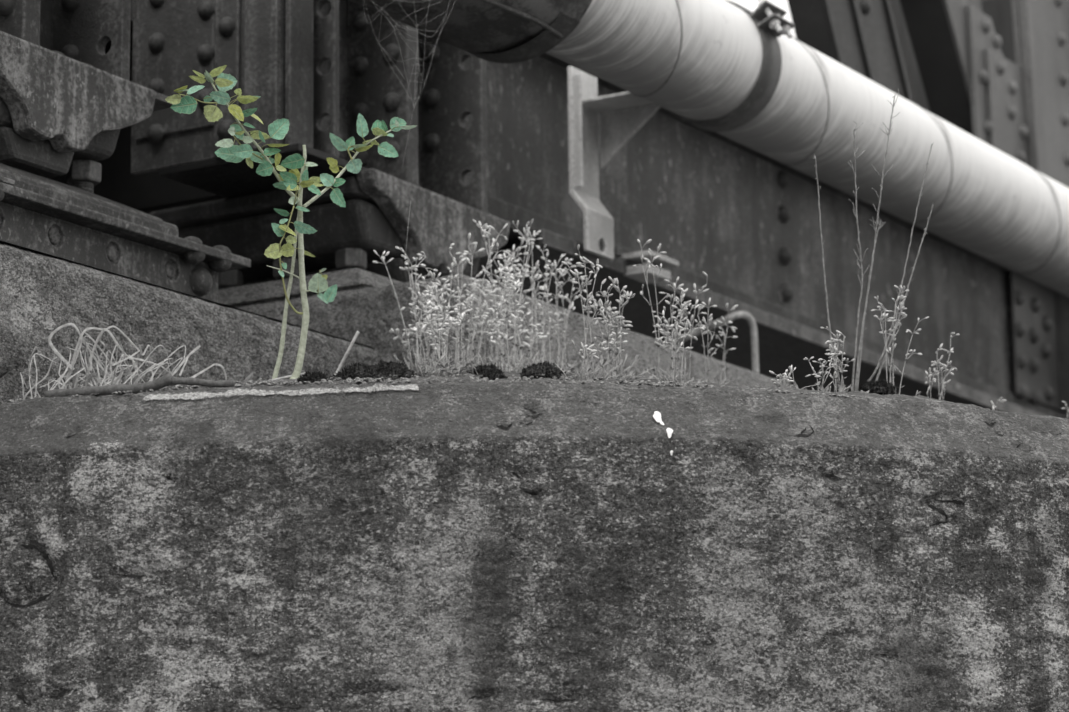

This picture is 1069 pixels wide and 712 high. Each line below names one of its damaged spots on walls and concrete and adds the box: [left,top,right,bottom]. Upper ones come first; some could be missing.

leakage [1025,511,1069,712]